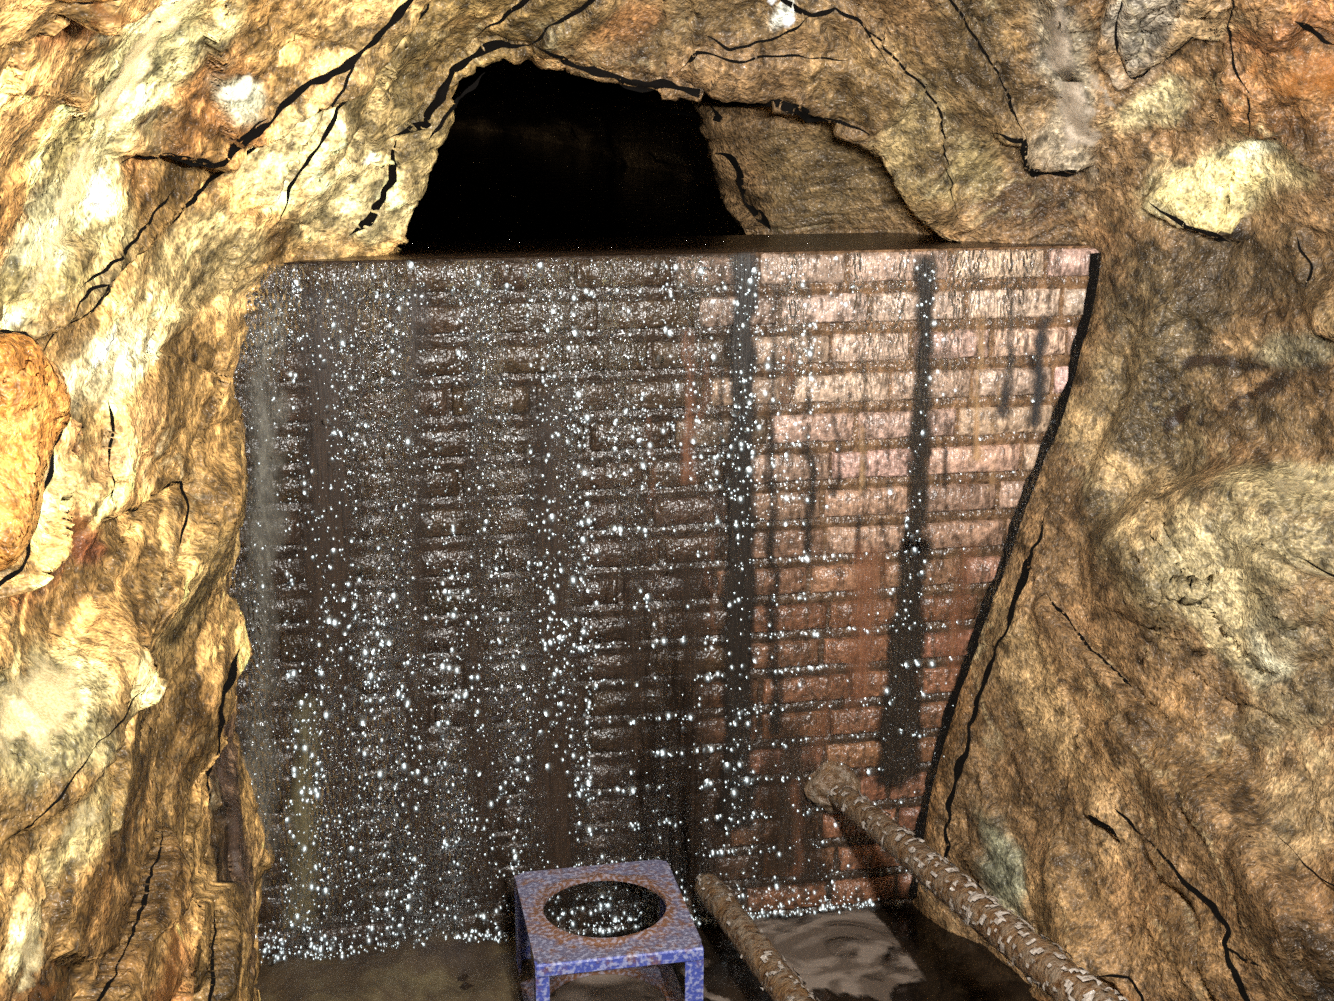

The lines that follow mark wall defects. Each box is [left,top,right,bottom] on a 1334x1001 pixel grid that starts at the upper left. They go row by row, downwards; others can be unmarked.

leakage [997,314,1014,417]
leakage [1029,316,1048,428]
leakage [832,416,841,497]
leakage [874,256,947,788]
leakage [611,254,826,909]
leakage [827,782,1129,1001]
leakage [760,951,820,1001]